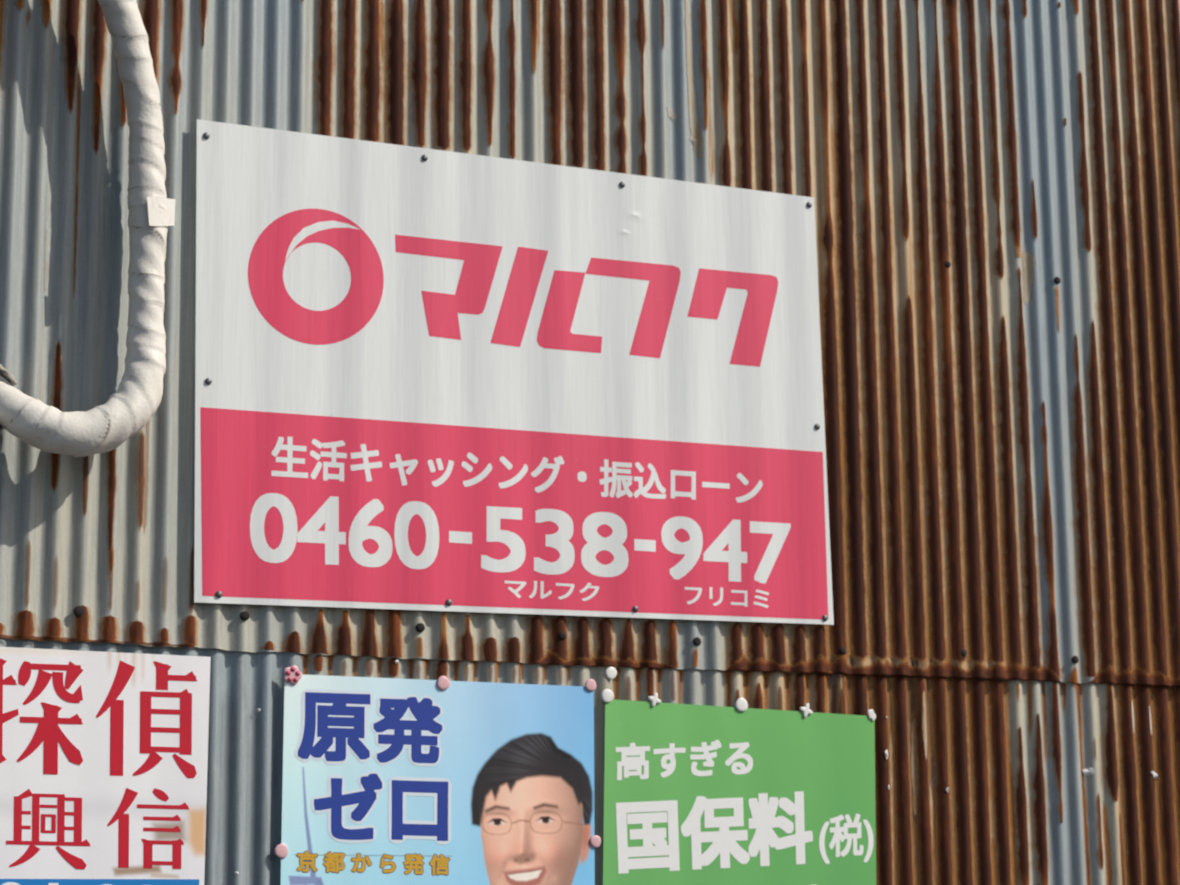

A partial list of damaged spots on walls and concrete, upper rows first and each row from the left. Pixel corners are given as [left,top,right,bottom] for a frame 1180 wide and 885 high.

corrosion [0,0,106,295]
corrosion [142,0,184,114]
corrosion [317,0,495,153]
corrosion [508,0,516,159]
corrosion [529,0,647,176]
corrosion [53,340,62,411]
corrosion [51,453,59,491]
corrosion [108,448,116,572]
corrosion [700,0,1180,885]
corrosion [0,547,197,648]
corrosion [264,609,698,704]